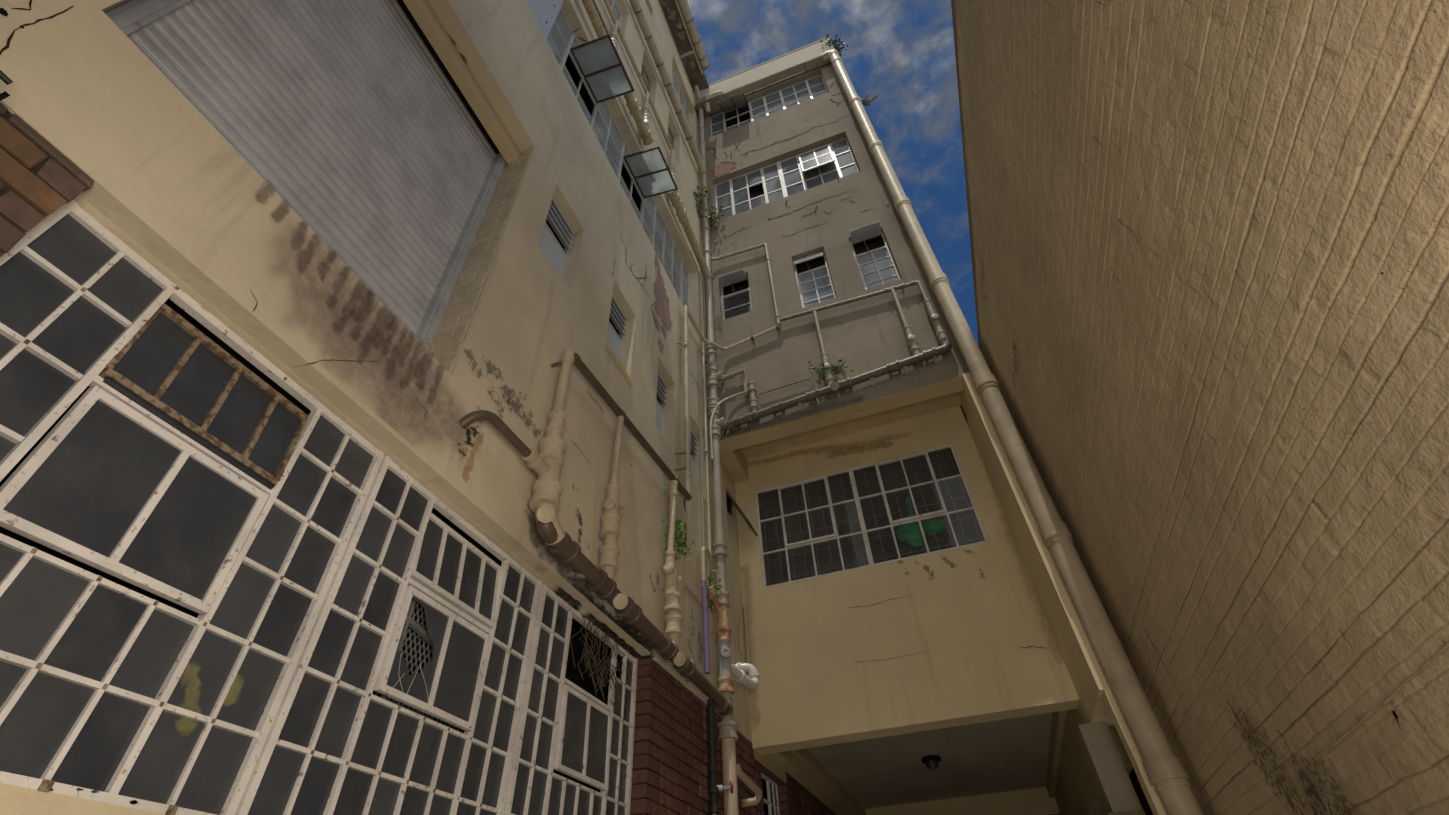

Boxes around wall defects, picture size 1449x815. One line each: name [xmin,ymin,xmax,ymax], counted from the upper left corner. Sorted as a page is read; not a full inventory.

crack [726,180,870,238]
leakage [285,249,540,456]
leakage [1219,694,1365,815]